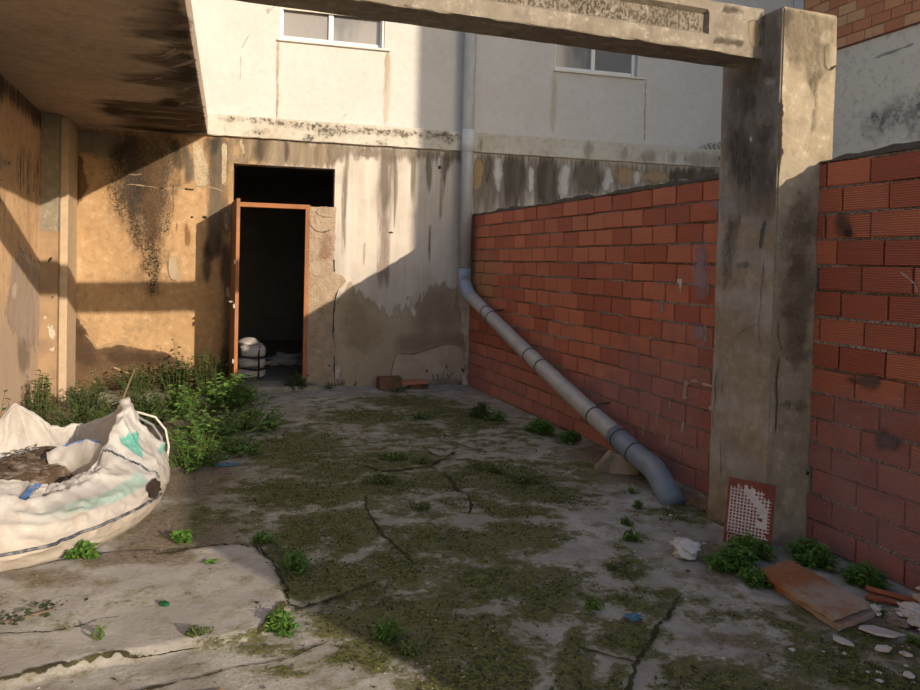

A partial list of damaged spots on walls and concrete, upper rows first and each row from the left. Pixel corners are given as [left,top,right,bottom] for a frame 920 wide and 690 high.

damp [103,2,460,372]
peeling [391,345,464,385]
crack [357,428,486,514]
crack [364,496,414,564]
crack [158,543,381,635]
crack [0,616,117,634]
crack [0,648,194,680]
crack [140,641,327,690]
crack [578,594,681,690]